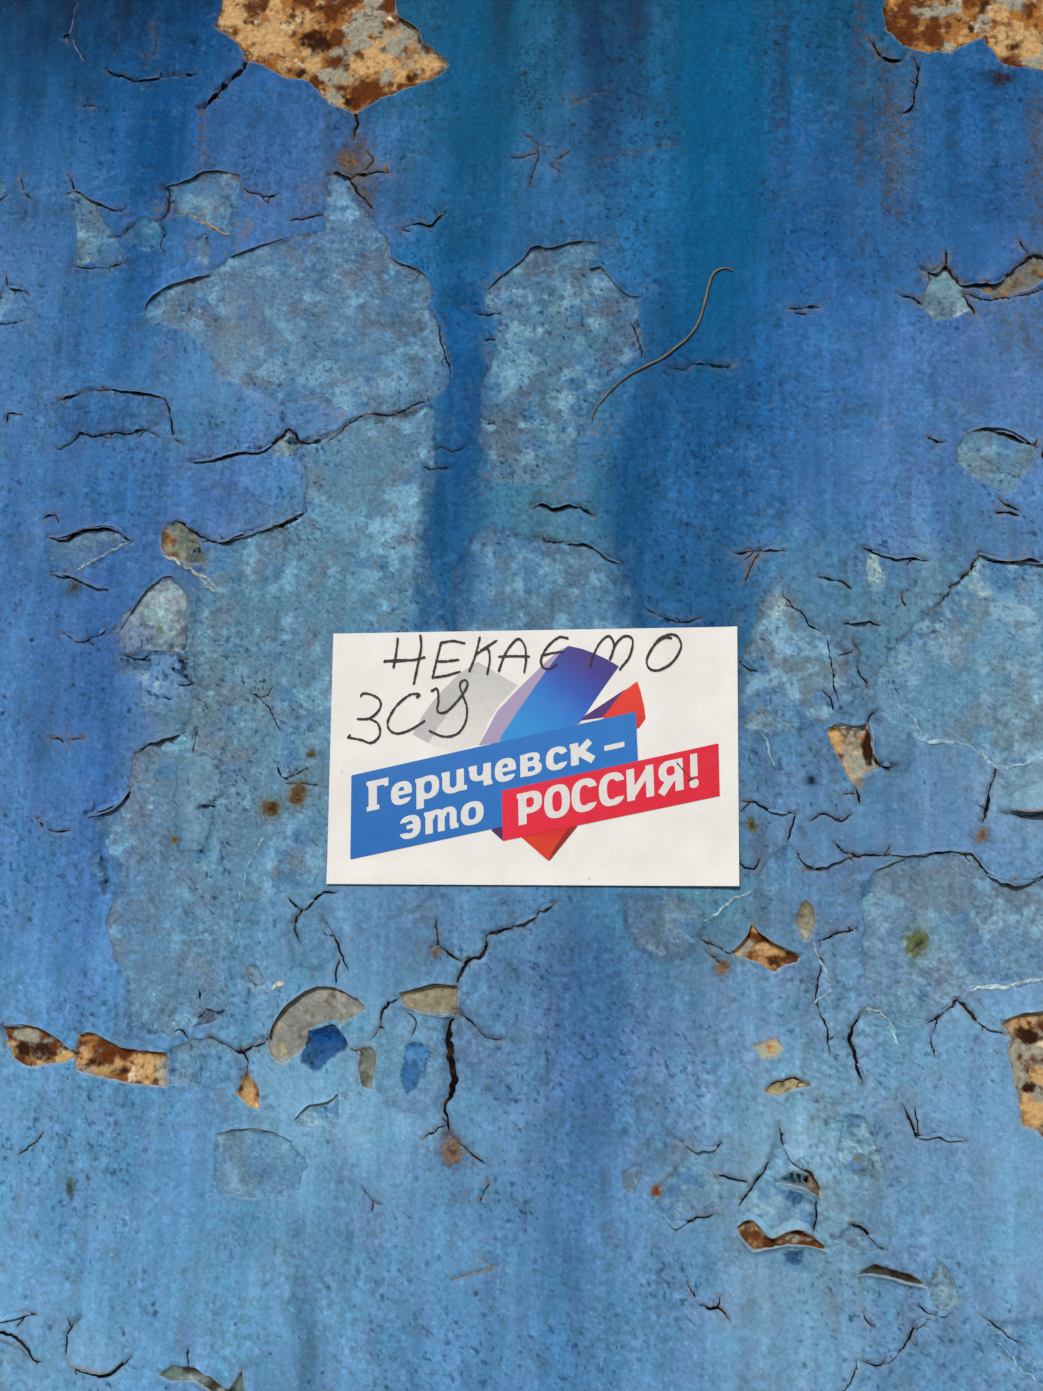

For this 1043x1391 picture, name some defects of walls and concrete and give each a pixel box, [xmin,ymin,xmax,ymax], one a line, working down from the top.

rust [216,0,449,114]
rust [883,0,1043,85]
peeling [66,188,166,266]
peeling [956,423,1037,496]
peeling [44,521,131,589]
peeling [86,167,643,1094]
crack [782,548,1043,724]
crack [741,760,1043,887]
rust [4,1021,168,1086]
crack [343,903,553,1202]
crack [814,927,863,1084]
rust [1001,1003,1043,1136]